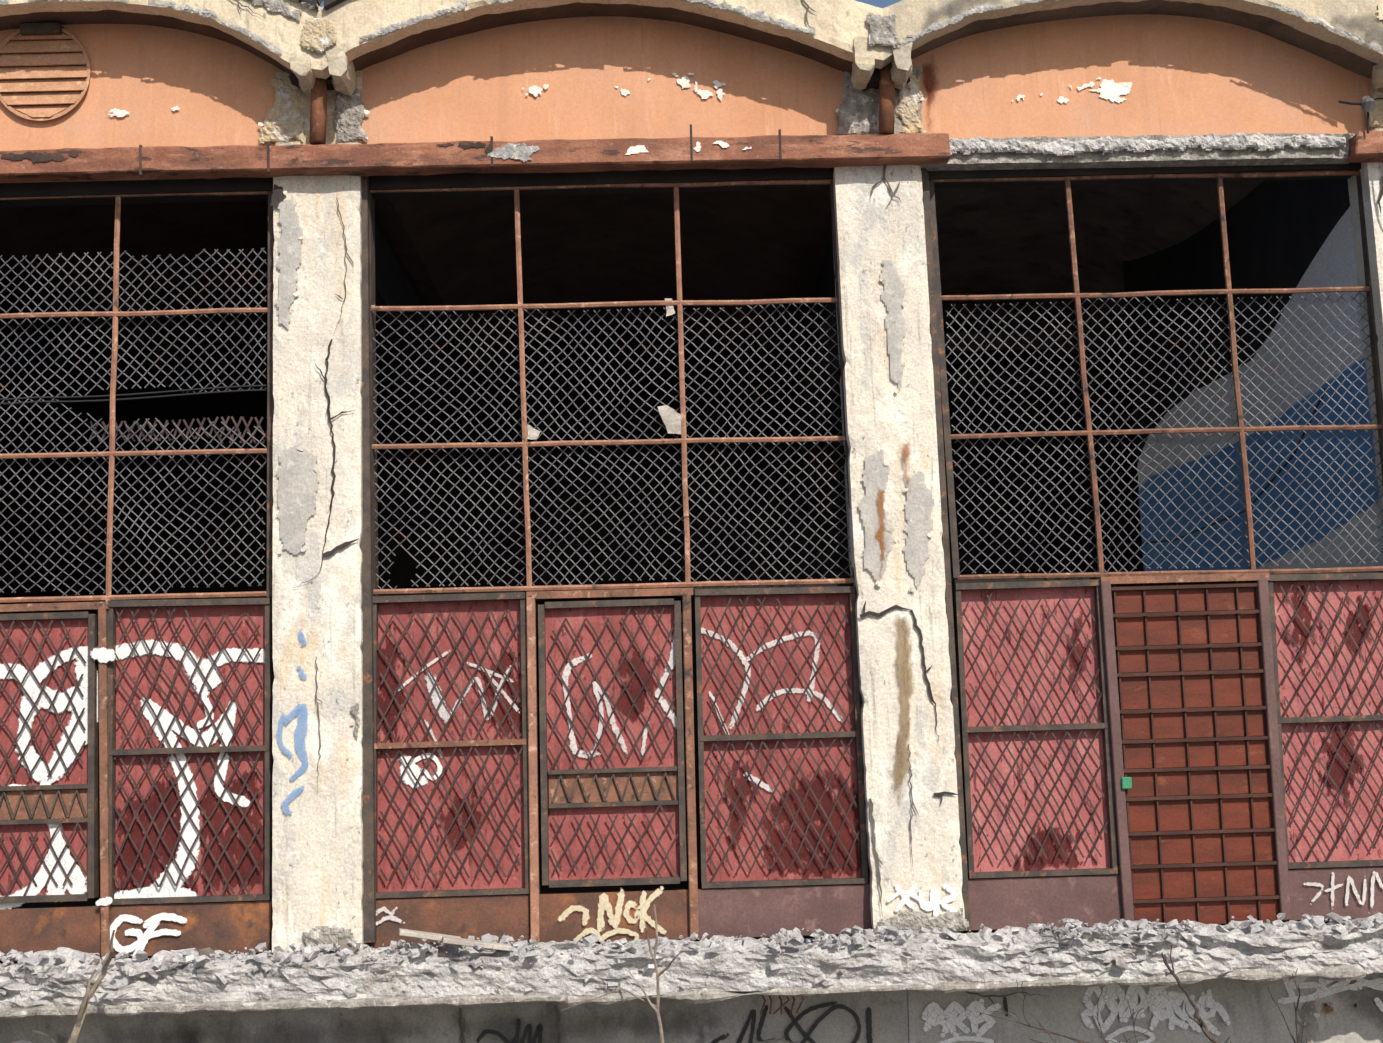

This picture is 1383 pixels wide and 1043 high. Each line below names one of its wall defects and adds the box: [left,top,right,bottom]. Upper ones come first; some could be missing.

peeling [522,84,549,97]
peeling [672,72,726,101]
peeling [1012,77,1133,103]
spalling [949,133,1346,156]
peeling [270,184,303,329]
crack [294,198,359,588]
peeling [879,260,906,393]
peeling [859,449,934,592]
leakage [893,619,913,800]
crack [860,601,958,916]